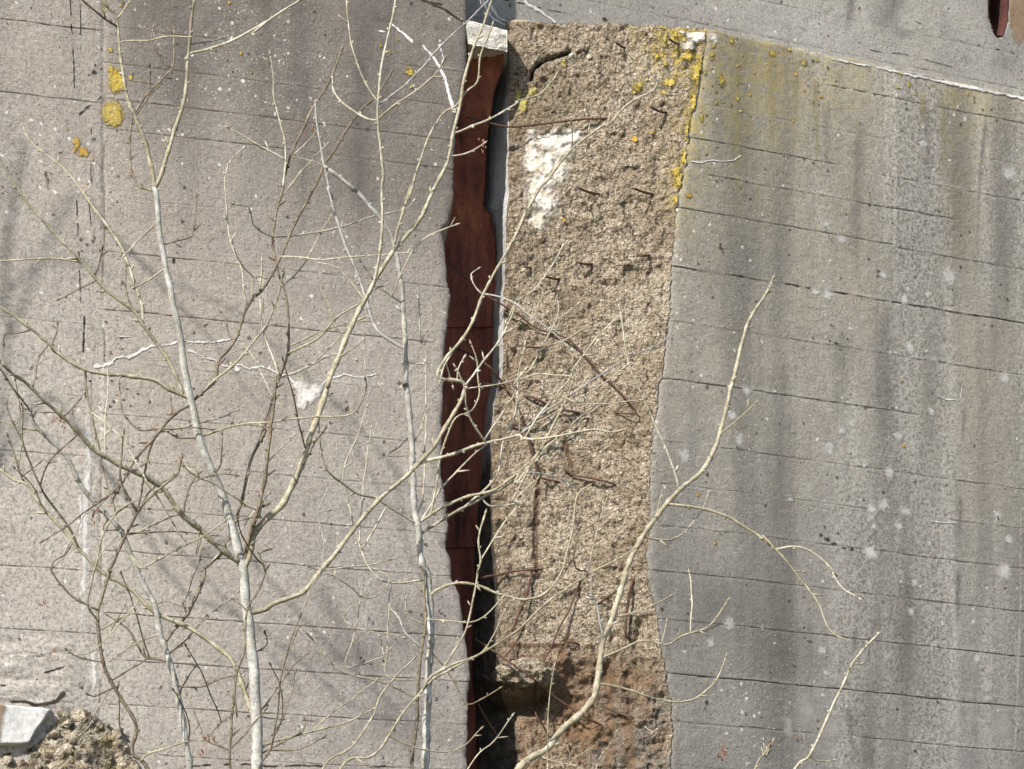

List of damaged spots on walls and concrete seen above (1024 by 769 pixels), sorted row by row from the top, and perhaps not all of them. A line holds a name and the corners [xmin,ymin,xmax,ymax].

crack [69,0,101,132]
spalling [467,116,608,135]
crack [530,53,571,81]
water stain [831,58,1024,100]
crack [76,165,377,410]
spalling [446,261,636,414]
rust [440,42,504,769]
spalling [452,345,617,485]
spalling [464,568,604,727]
rust [505,639,577,647]
spalling [598,578,634,640]